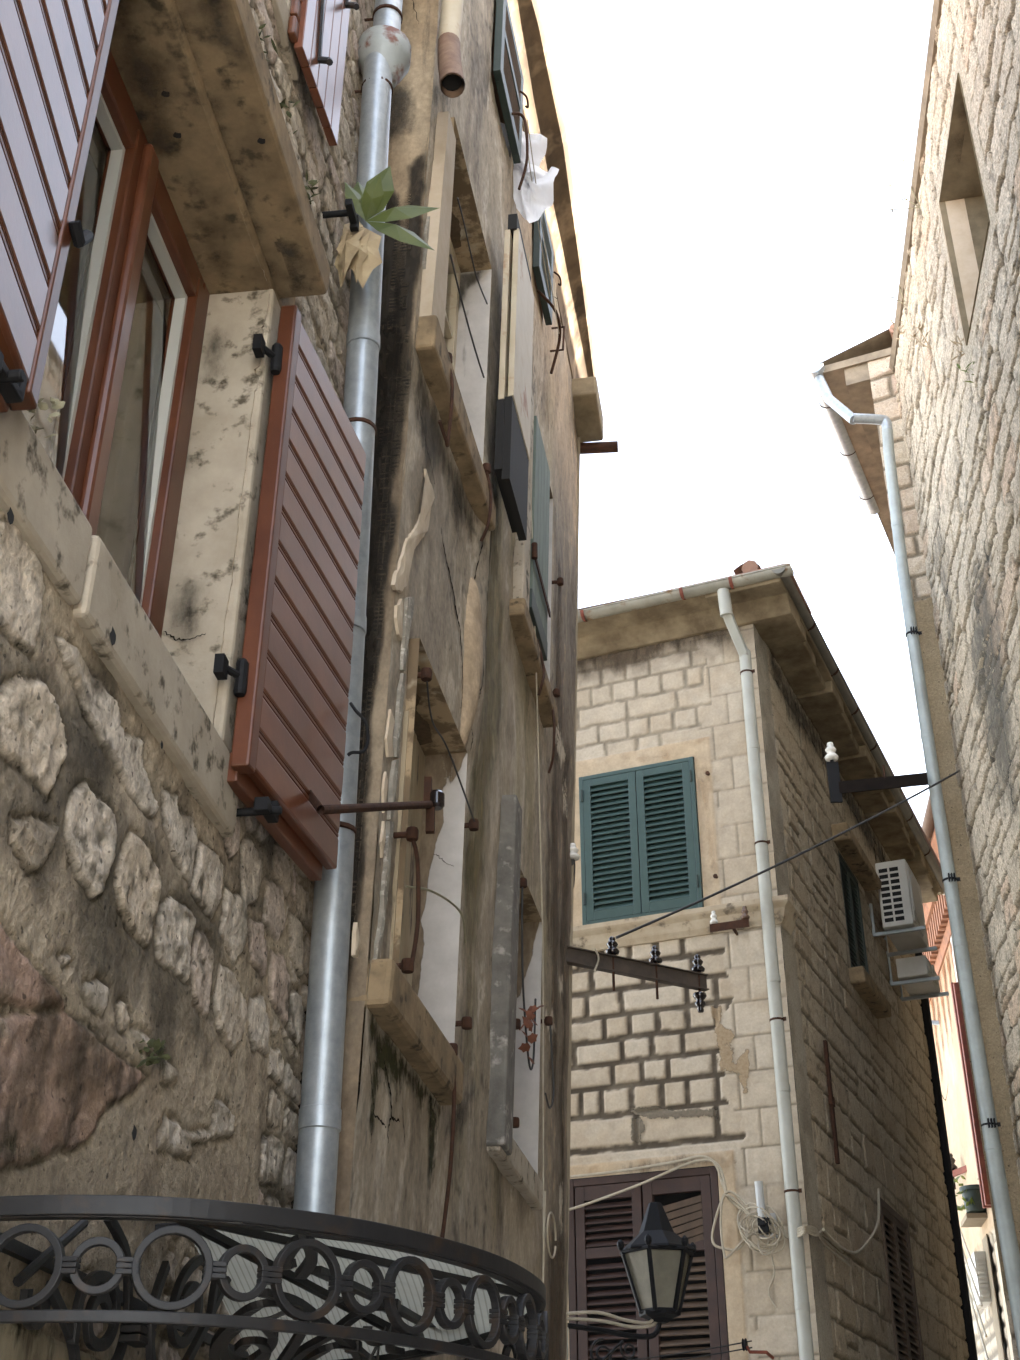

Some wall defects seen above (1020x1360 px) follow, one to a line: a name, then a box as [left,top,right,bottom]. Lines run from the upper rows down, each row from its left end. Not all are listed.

damp [116,0,173,154]
damp [347,155,503,984]